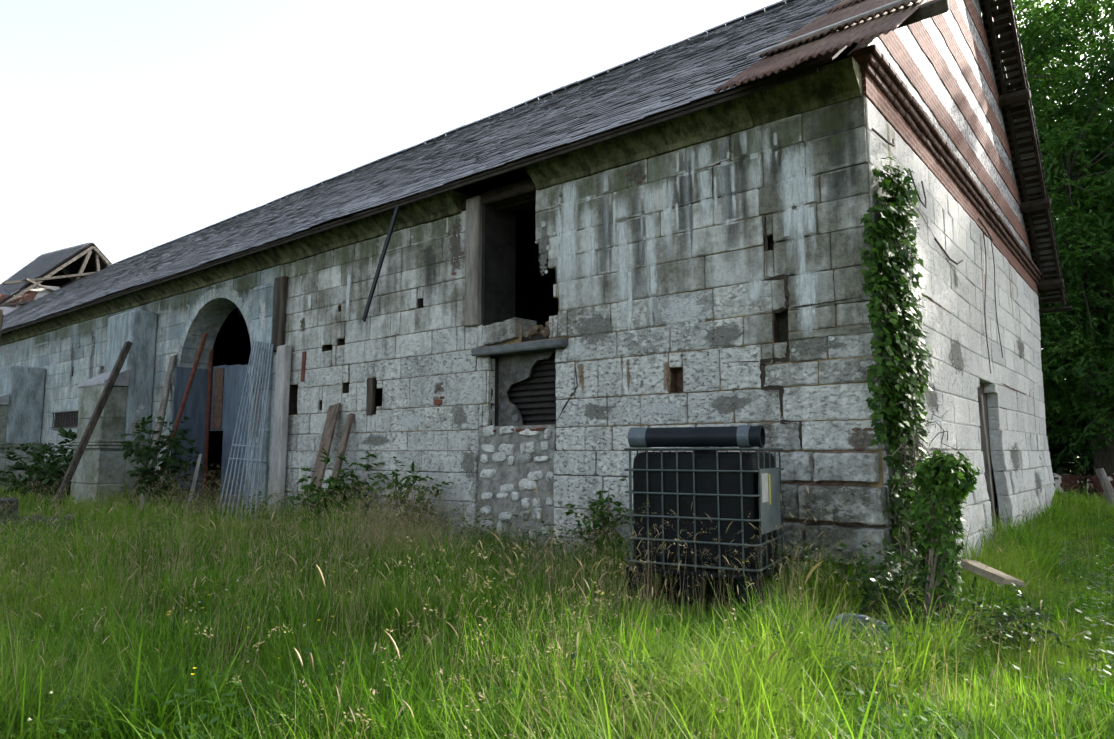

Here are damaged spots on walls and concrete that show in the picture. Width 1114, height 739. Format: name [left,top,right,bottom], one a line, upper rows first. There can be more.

spalling [539,221,550,275]
damp [552,119,818,329]
peeling [498,312,614,426]